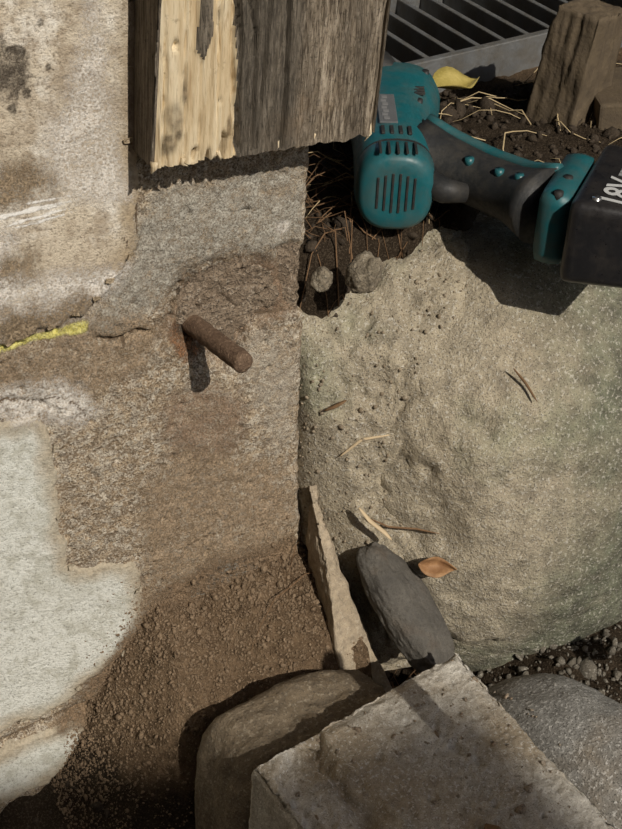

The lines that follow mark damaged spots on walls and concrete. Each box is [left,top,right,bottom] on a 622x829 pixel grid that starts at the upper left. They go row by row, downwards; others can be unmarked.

leakage [0,0,302,345]